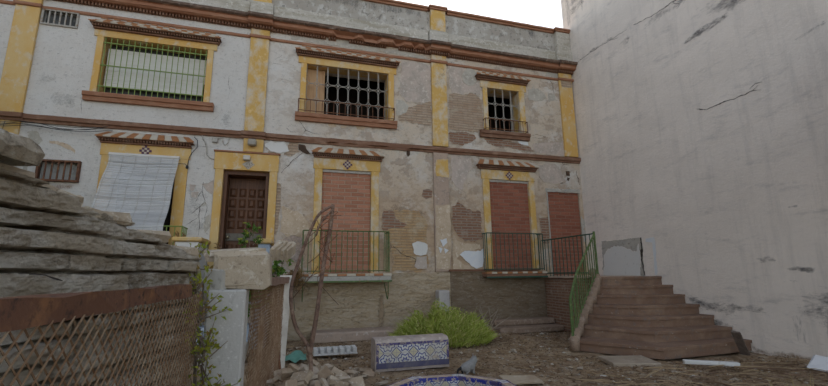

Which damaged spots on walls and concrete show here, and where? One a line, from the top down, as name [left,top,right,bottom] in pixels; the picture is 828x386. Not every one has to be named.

crack [578,0,679,62]
peeling [377,47,432,126]
flaking render [448,92,484,190]
flaking render [382,188,483,273]